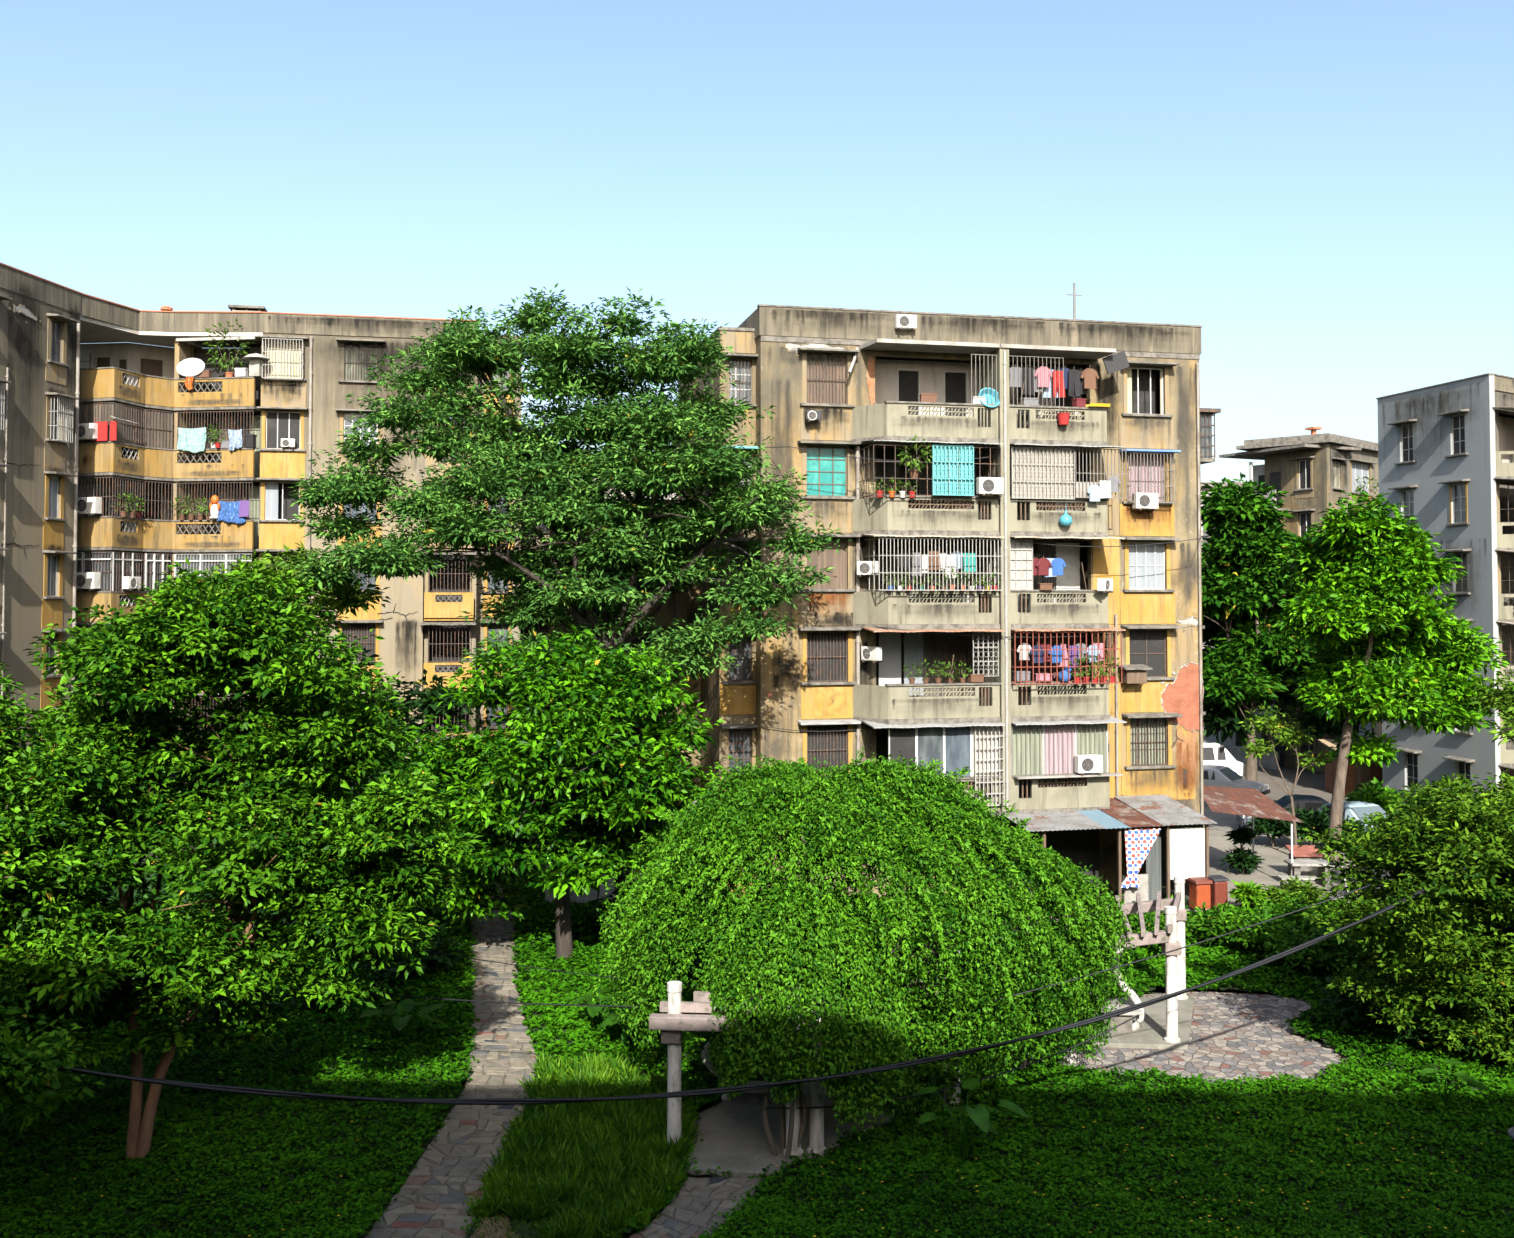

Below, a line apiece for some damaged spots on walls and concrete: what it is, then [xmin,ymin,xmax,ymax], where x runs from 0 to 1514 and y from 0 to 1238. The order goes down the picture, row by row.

spalling [1161,662,1204,775]